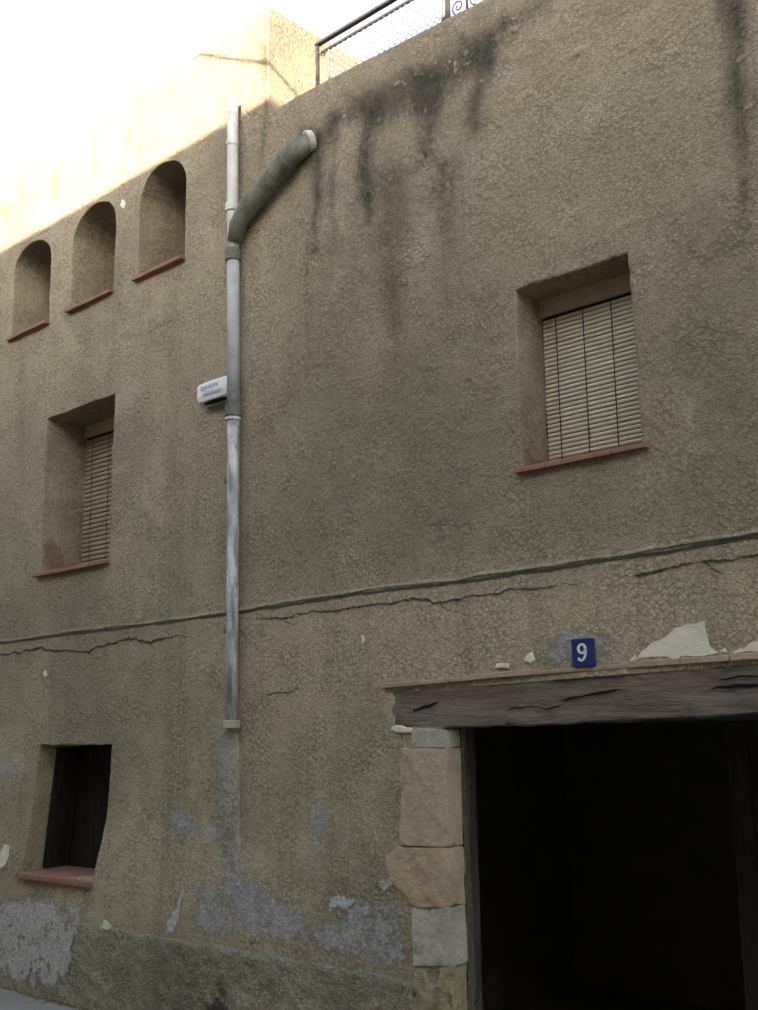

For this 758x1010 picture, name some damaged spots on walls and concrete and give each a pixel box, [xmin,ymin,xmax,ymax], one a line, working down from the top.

crack [631,553,758,577]
crack [256,582,583,625]
crack [0,634,190,656]
spalling [629,621,758,661]
peeling [329,895,354,912]